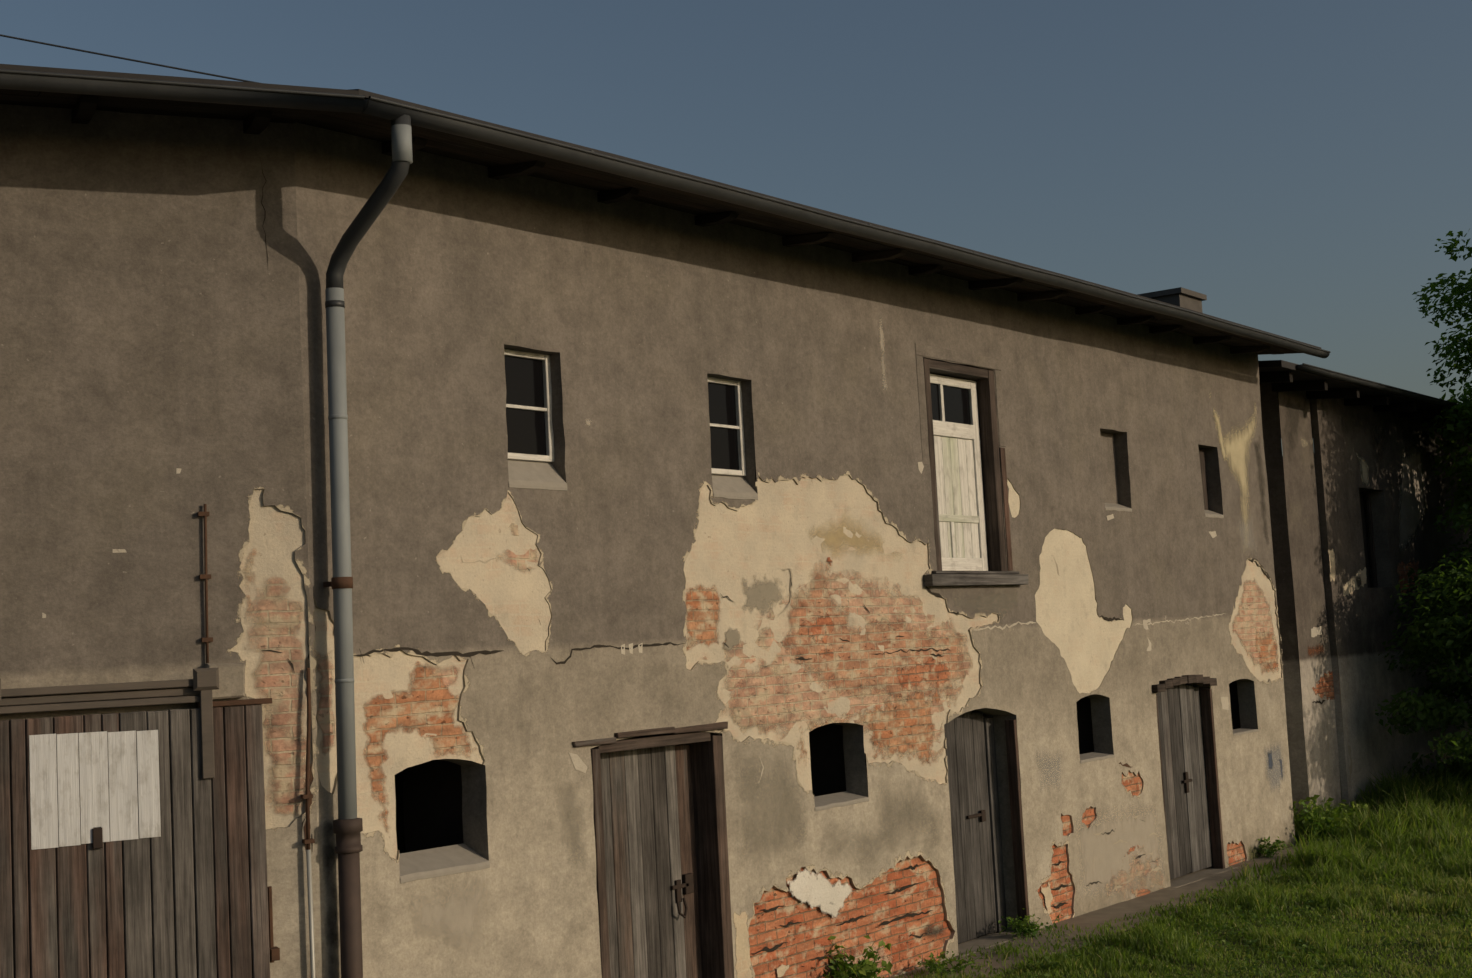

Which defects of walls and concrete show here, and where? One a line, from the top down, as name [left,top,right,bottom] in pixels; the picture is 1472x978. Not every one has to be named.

flaking render [227,487,337,830]
flaking render [353,644,485,862]
crack [353,647,504,666]
flaking render [436,490,553,657]
flaking render [682,471,1000,796]
flaking render [1035,528,1167,693]
flaking render [1229,558,1283,685]
spalling [1312,671,1341,704]
spalling [733,850,955,978]